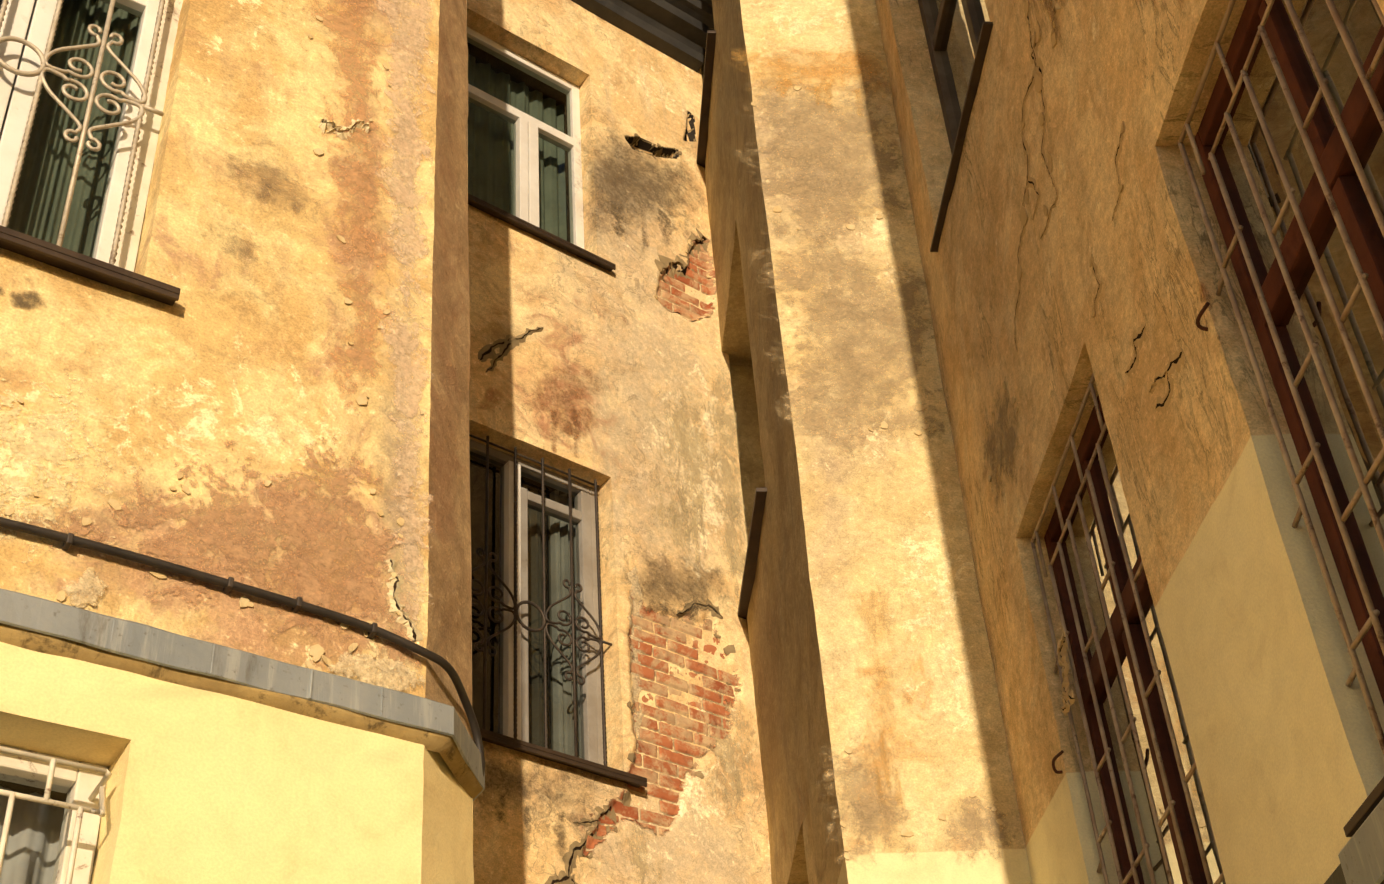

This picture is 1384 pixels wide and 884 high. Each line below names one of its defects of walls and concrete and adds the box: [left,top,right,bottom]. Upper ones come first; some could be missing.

peeling [624,133,682,158]
crack [1014,0,1061,352]
crack [1112,121,1125,221]
flaking render [654,228,717,321]
crack [1089,254,1103,317]
crack [1125,324,1184,413]
crack [383,558,423,641]
flaking render [581,566,741,858]
crack [544,799,616,884]